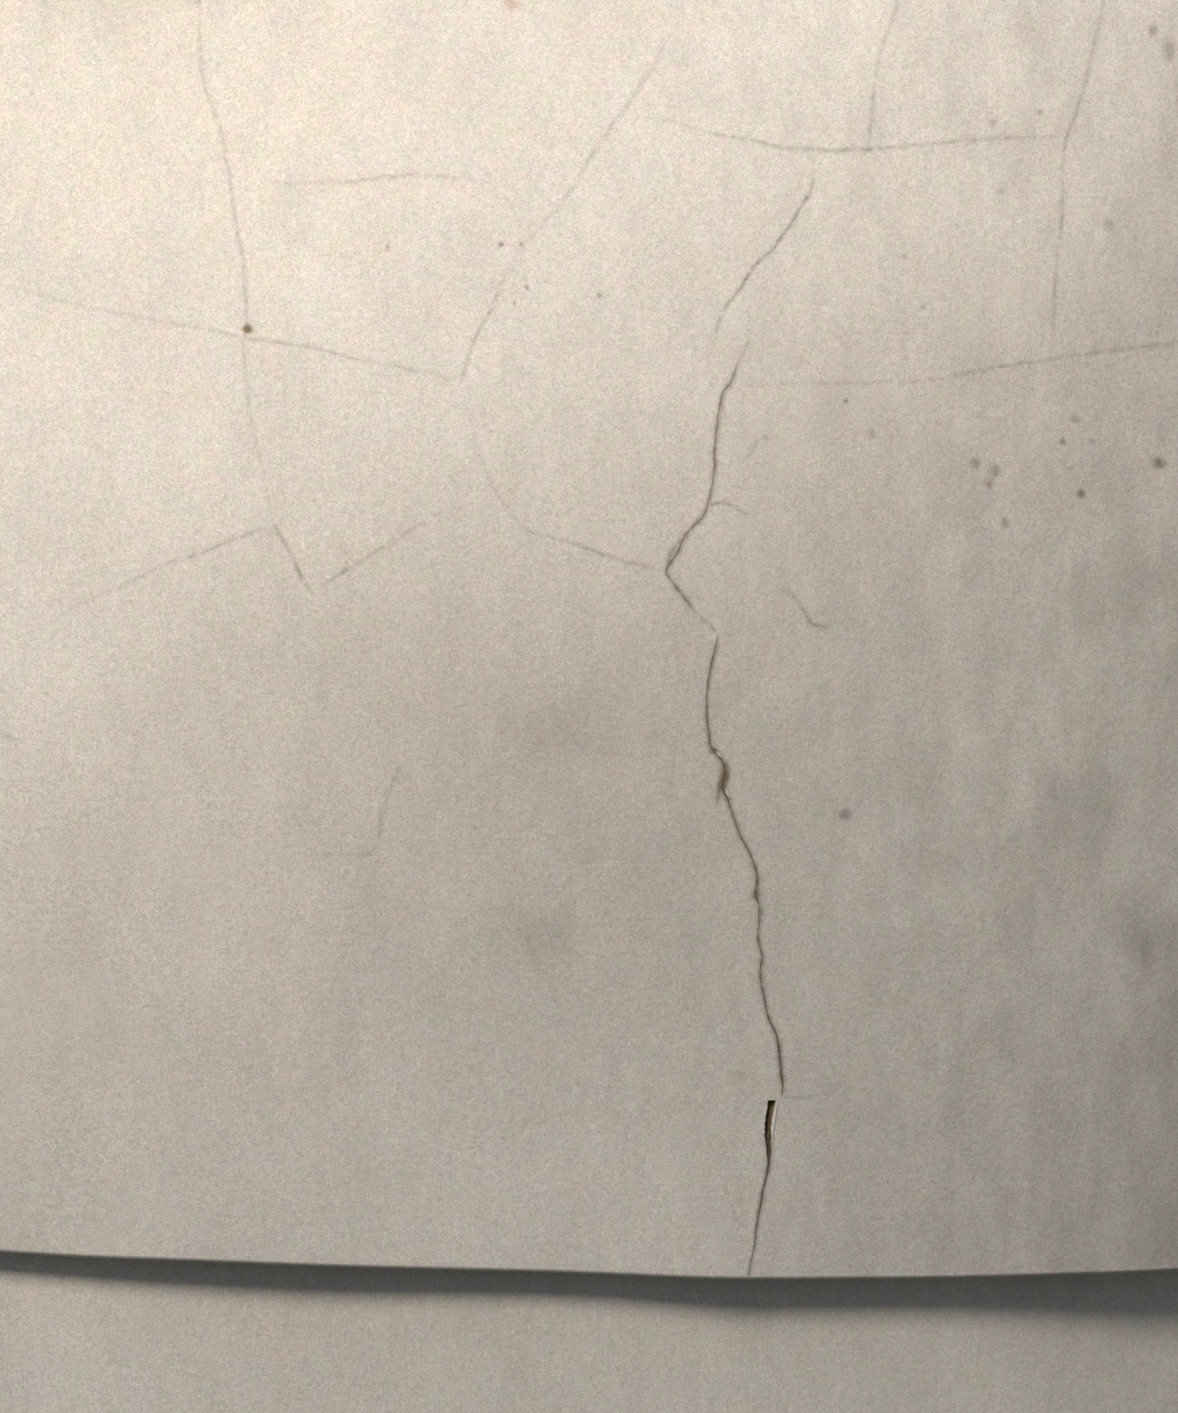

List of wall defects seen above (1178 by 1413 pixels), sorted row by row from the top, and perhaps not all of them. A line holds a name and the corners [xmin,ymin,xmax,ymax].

crack [666,359,784,1266]